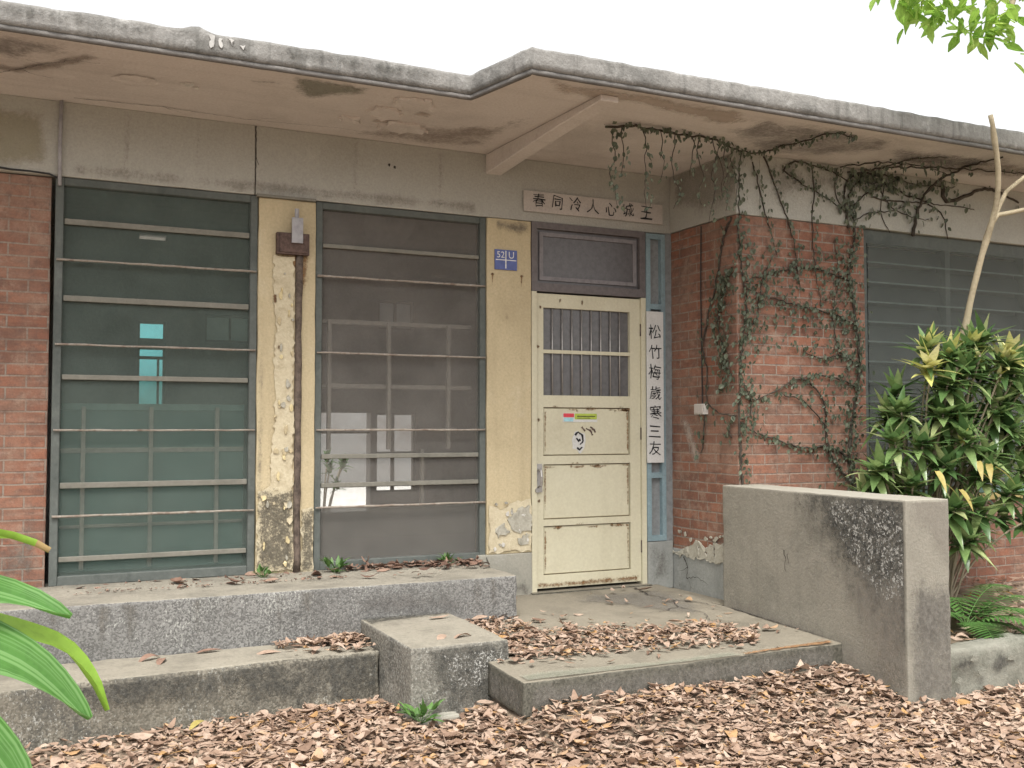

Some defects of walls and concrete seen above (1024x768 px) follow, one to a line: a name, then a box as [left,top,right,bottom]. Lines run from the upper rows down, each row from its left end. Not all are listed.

spalling [209,34,245,50]
peeling [255,255,314,572]
peeling [488,499,532,554]
flaking render [673,530,724,564]
damp [798,493,905,645]